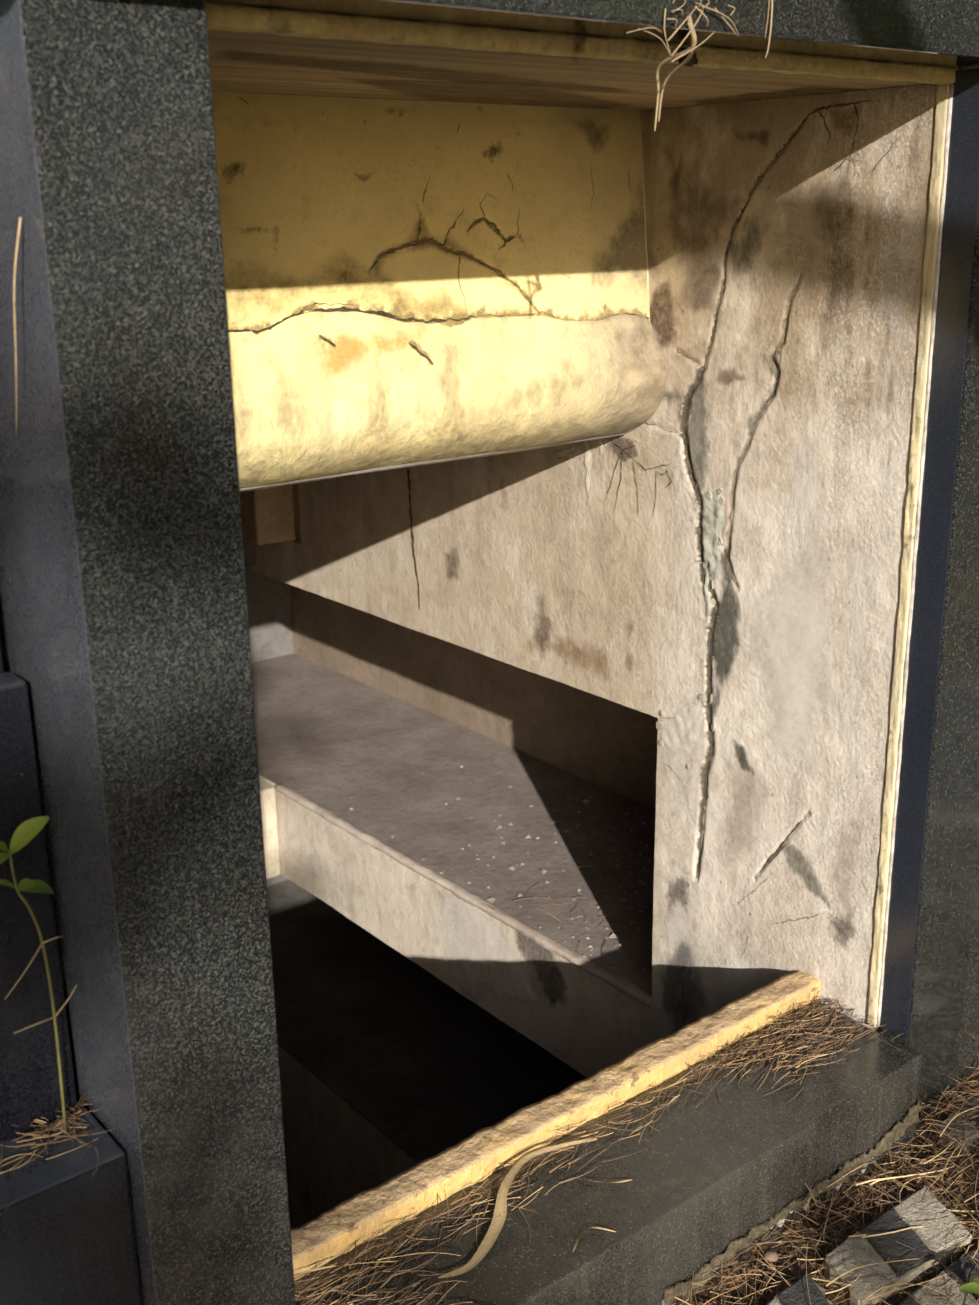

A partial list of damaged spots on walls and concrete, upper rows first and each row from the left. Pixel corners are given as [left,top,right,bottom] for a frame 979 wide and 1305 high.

crack [228,173,649,365]
crack [407,469,420,610]
crack [605,100,895,878]
water stain [537,602,549,646]
water stain [444,896,564,1003]
water stain [664,880,704,1032]